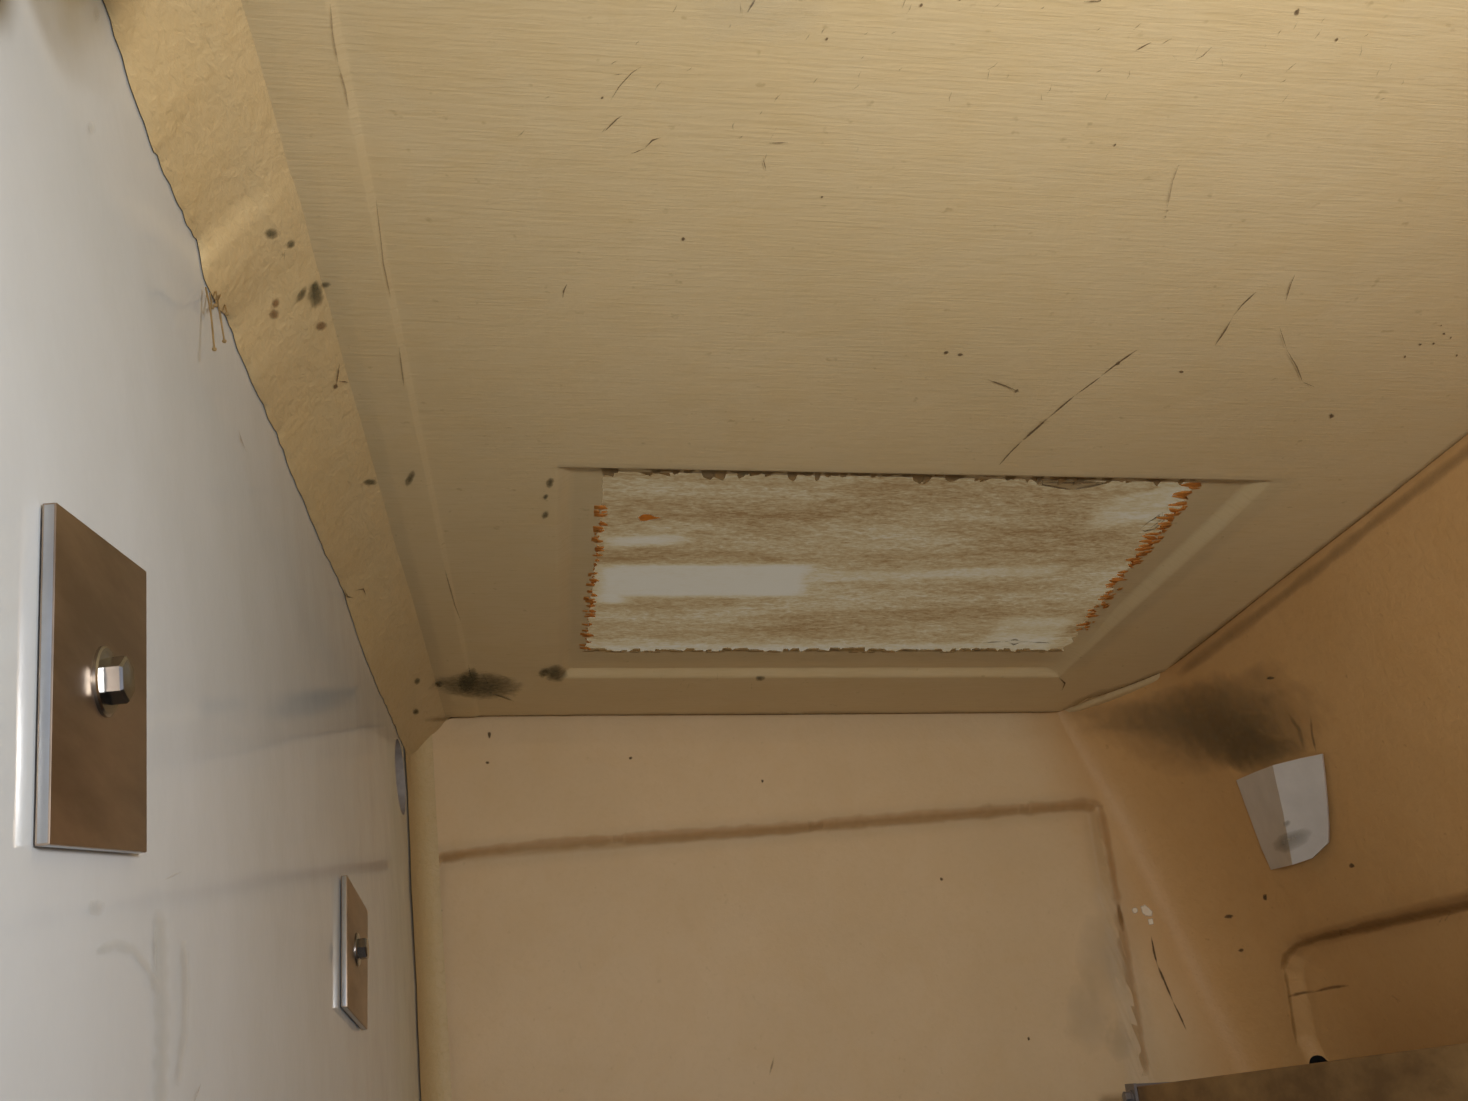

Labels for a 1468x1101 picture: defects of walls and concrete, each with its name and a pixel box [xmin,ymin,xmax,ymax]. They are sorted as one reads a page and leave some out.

damp [416,670,510,700]